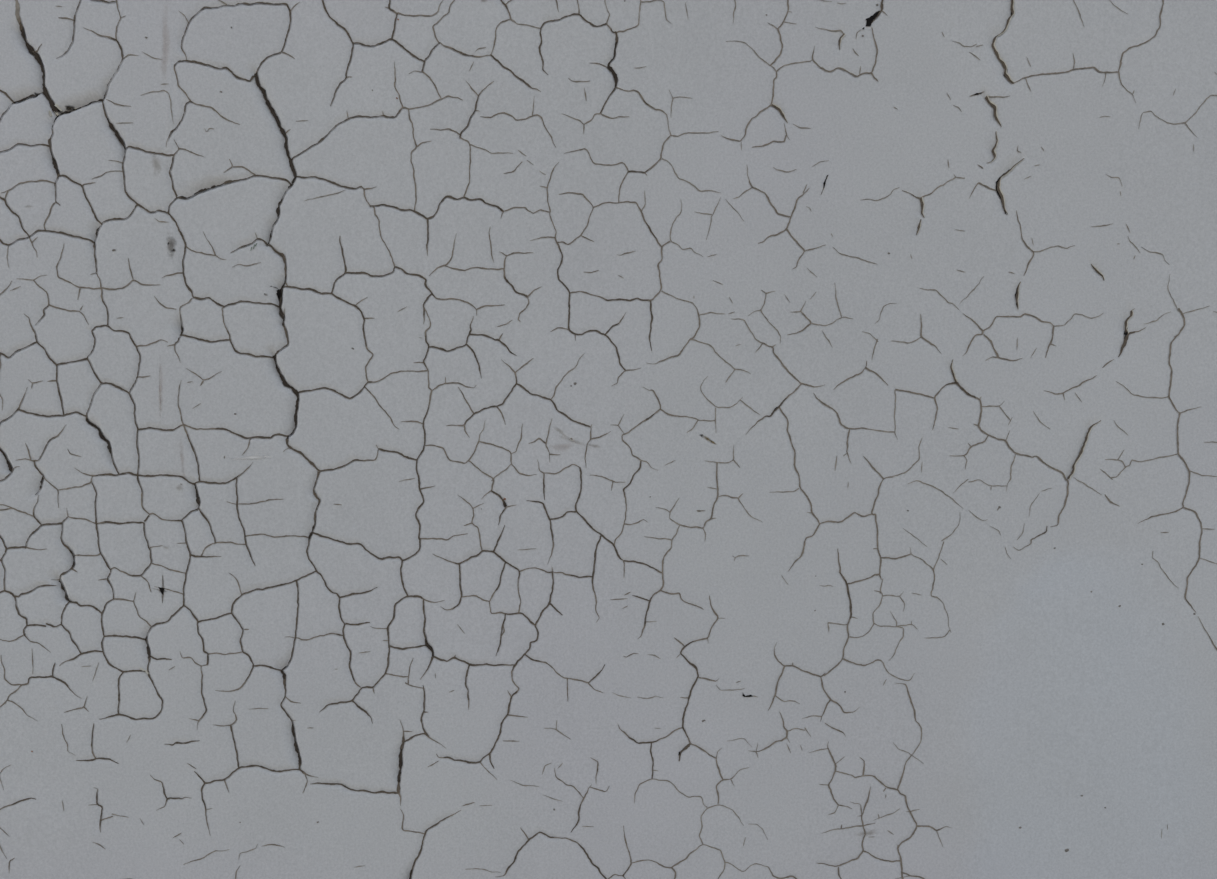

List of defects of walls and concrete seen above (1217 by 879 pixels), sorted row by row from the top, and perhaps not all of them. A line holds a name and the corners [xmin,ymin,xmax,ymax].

crack [1014,0,1164,117]
crack [920,211,1103,361]
crack [1092,223,1165,260]
crack [814,360,1119,550]